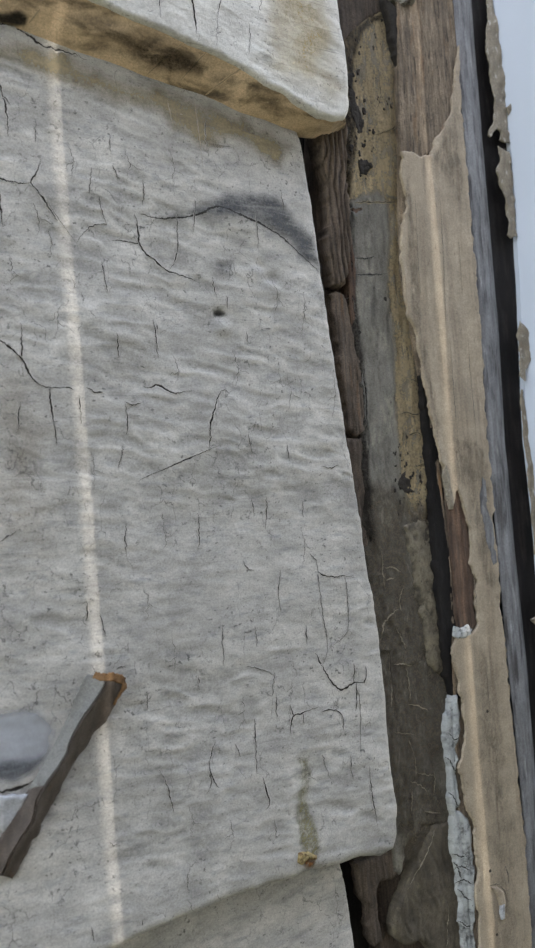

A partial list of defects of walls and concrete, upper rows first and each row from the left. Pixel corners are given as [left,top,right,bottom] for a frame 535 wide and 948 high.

crack [0,83,10,136]
crack [189,0,222,38]
peeling [395,0,457,157]
crack [0,127,58,254]
crack [63,135,228,308]
crack [0,322,103,445]
crack [91,321,192,491]
crack [208,331,249,451]
peeling [442,465,476,639]
crack [85,602,106,636]
crack [159,497,509,948]
crack [0,780,33,795]